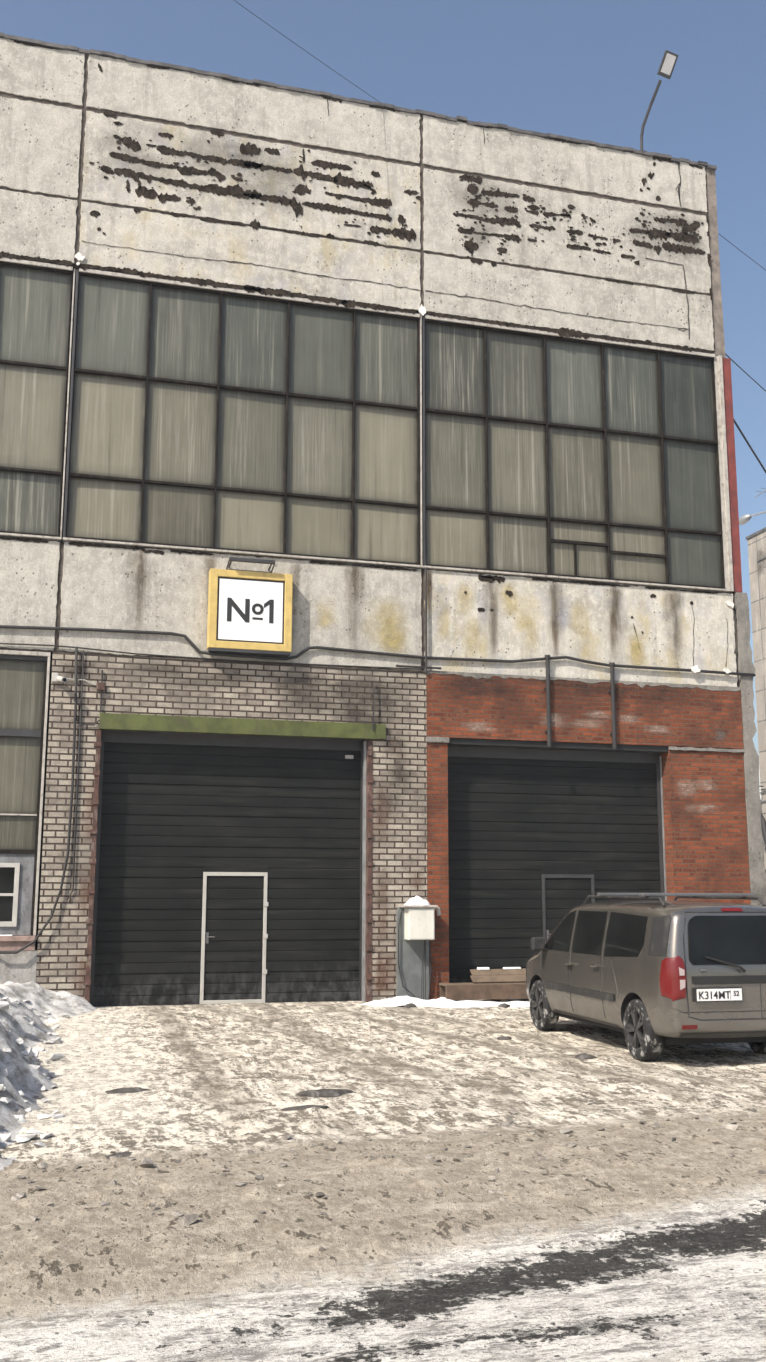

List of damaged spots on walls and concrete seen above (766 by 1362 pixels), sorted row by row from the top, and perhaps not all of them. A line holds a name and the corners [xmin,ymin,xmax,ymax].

peeling [89,110,423,247]
peeling [451,156,712,267]